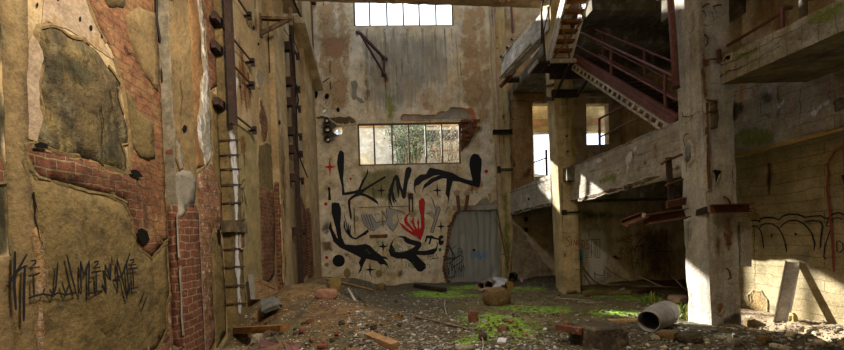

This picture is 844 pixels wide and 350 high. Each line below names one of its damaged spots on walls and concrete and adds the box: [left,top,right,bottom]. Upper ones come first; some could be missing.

crack [33,192,43,244]
peeling [21,0,223,350]
flaking render [255,68,287,291]
spalling [442,212,459,283]